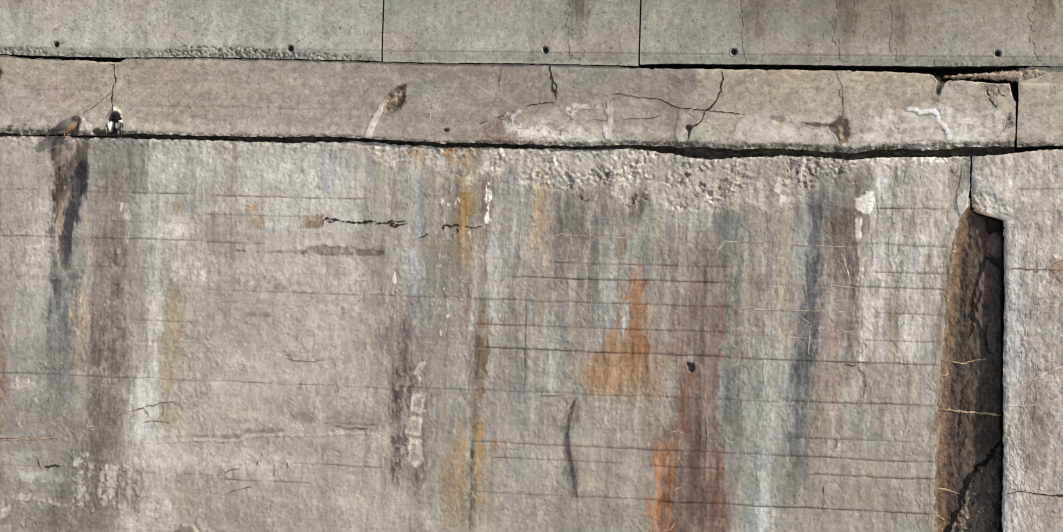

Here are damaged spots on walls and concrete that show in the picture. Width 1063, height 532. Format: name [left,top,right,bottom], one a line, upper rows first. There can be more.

efflorescence [482,99,614,144]
crack [596,72,746,145]
corrosion [768,113,854,147]
peeling [235,211,396,260]
crack [322,217,482,238]
leakage [36,136,165,509]
corrosion [439,147,498,532]
crack [524,304,577,485]
corrosion [579,207,732,532]
spalling [363,82,1040,532]
crack [0,437,60,468]